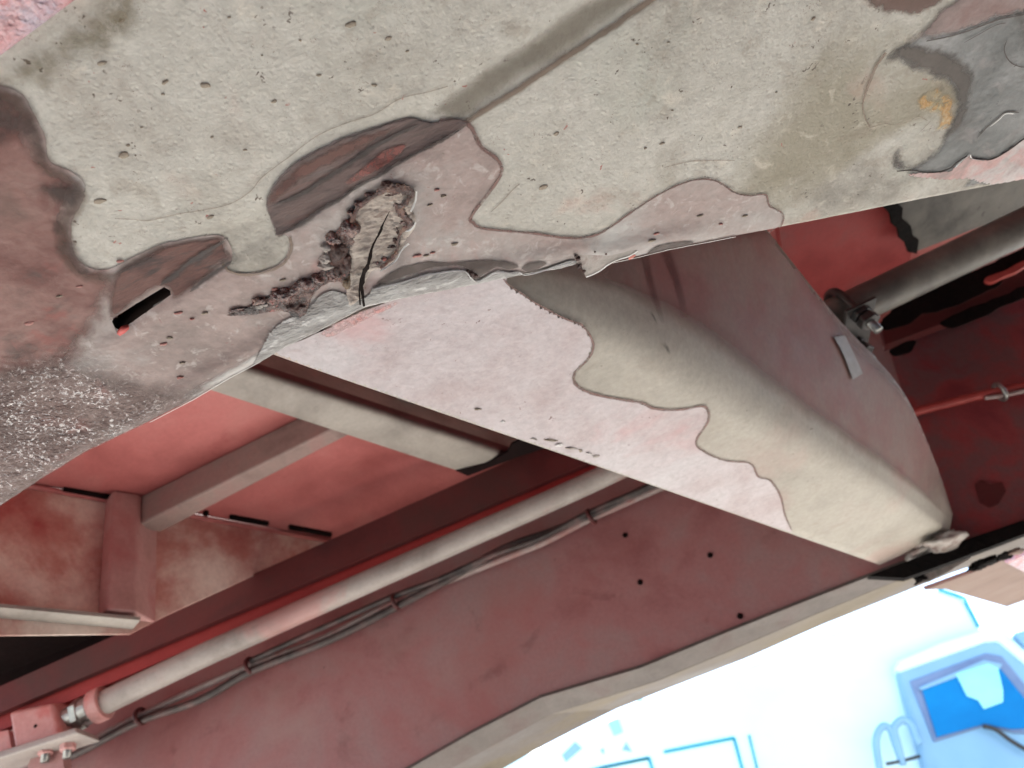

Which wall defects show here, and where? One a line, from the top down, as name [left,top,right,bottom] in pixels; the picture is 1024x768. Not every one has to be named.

corrosion [919,90,952,129]
damp [862,0,1024,174]
damp [0,85,792,532]
spalling [151,180,734,422]
peeling [530,438,600,458]